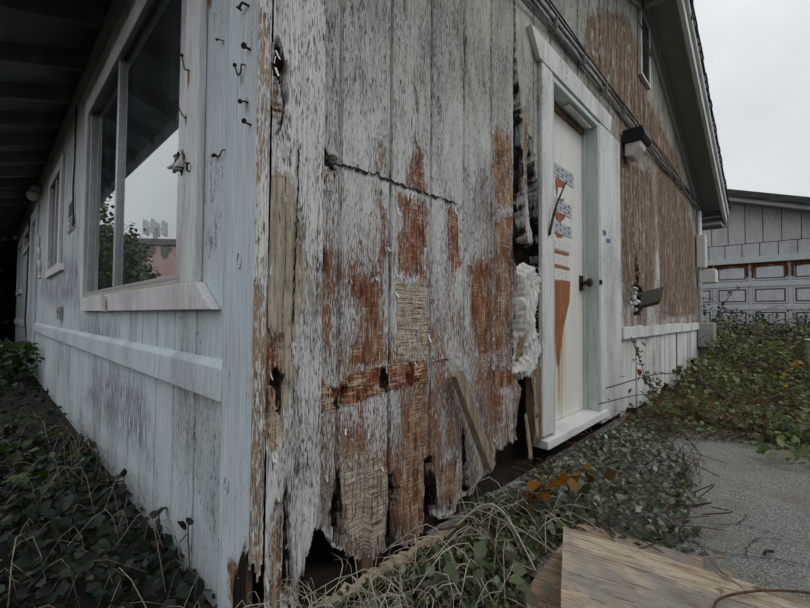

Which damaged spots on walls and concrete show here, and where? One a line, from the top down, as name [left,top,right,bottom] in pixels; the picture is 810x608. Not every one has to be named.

peeling [265,165,308,463]
crack [282,138,300,340]
crack [324,144,457,204]
peeling [322,78,465,543]
peeling [445,127,516,454]
peeling [582,4,810,323]